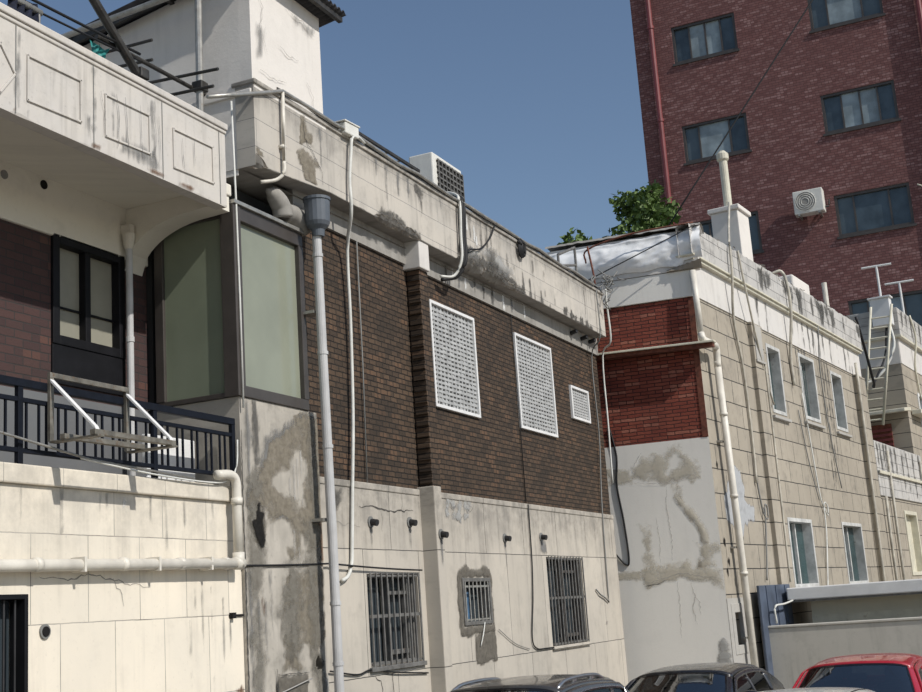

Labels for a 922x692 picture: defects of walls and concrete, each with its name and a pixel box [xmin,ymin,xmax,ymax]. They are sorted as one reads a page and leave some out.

peeling [297,116,323,185]
damp [386,170,422,204]
damp [445,268,512,310]
damp [758,268,770,290]
damp [783,285,845,484]
spalling [247,413,322,559]
crack [40,574,151,605]
spalling [284,571,326,670]